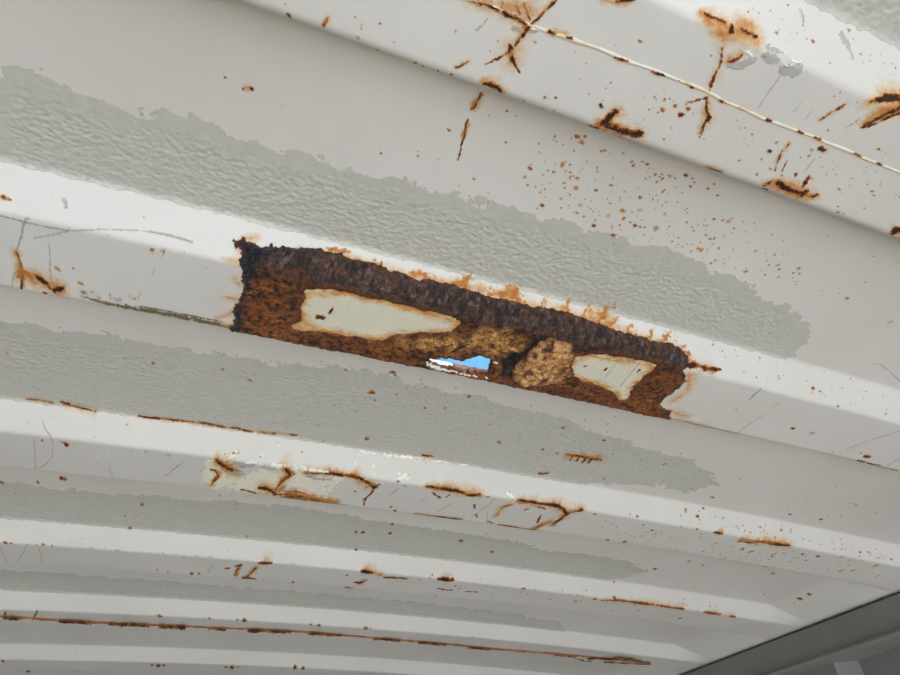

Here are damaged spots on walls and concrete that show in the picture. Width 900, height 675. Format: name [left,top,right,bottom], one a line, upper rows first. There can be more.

corrosion [469,0,528,26]
corrosion [698,10,760,91]
corrosion [554,103,645,152]
corrosion [857,90,900,129]
corrosion [756,142,820,199]
corrosion [16,270,65,294]
corrosion [217,236,742,435]
peeling [198,442,346,498]
peeling [349,448,481,484]
corrosion [738,524,820,574]
corrosion [108,614,187,630]
corrosion [236,618,291,634]